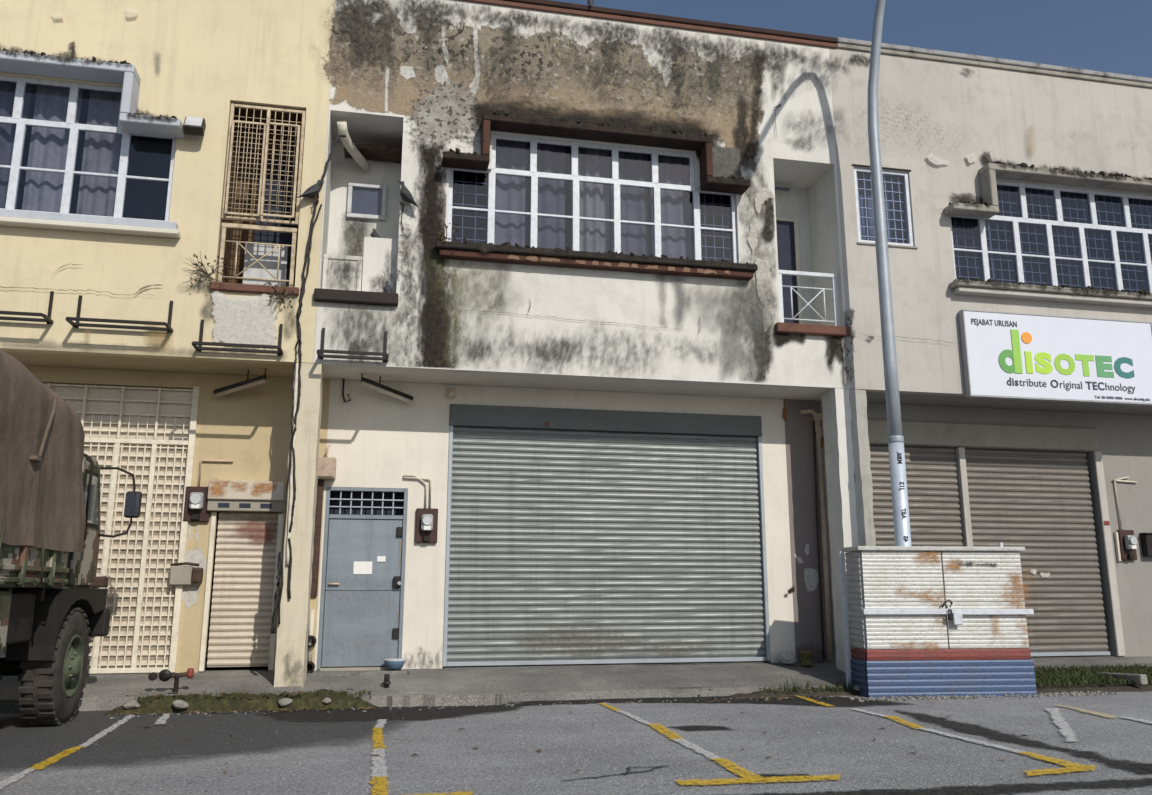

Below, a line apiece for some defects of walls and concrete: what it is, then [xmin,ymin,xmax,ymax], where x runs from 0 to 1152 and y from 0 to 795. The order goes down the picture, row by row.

peeling [323,0,775,332]
damp [331,0,870,382]
crack [0,264,161,296]
rust [211,482,275,495]
peeling [794,544,819,592]
rust [918,551,996,571]